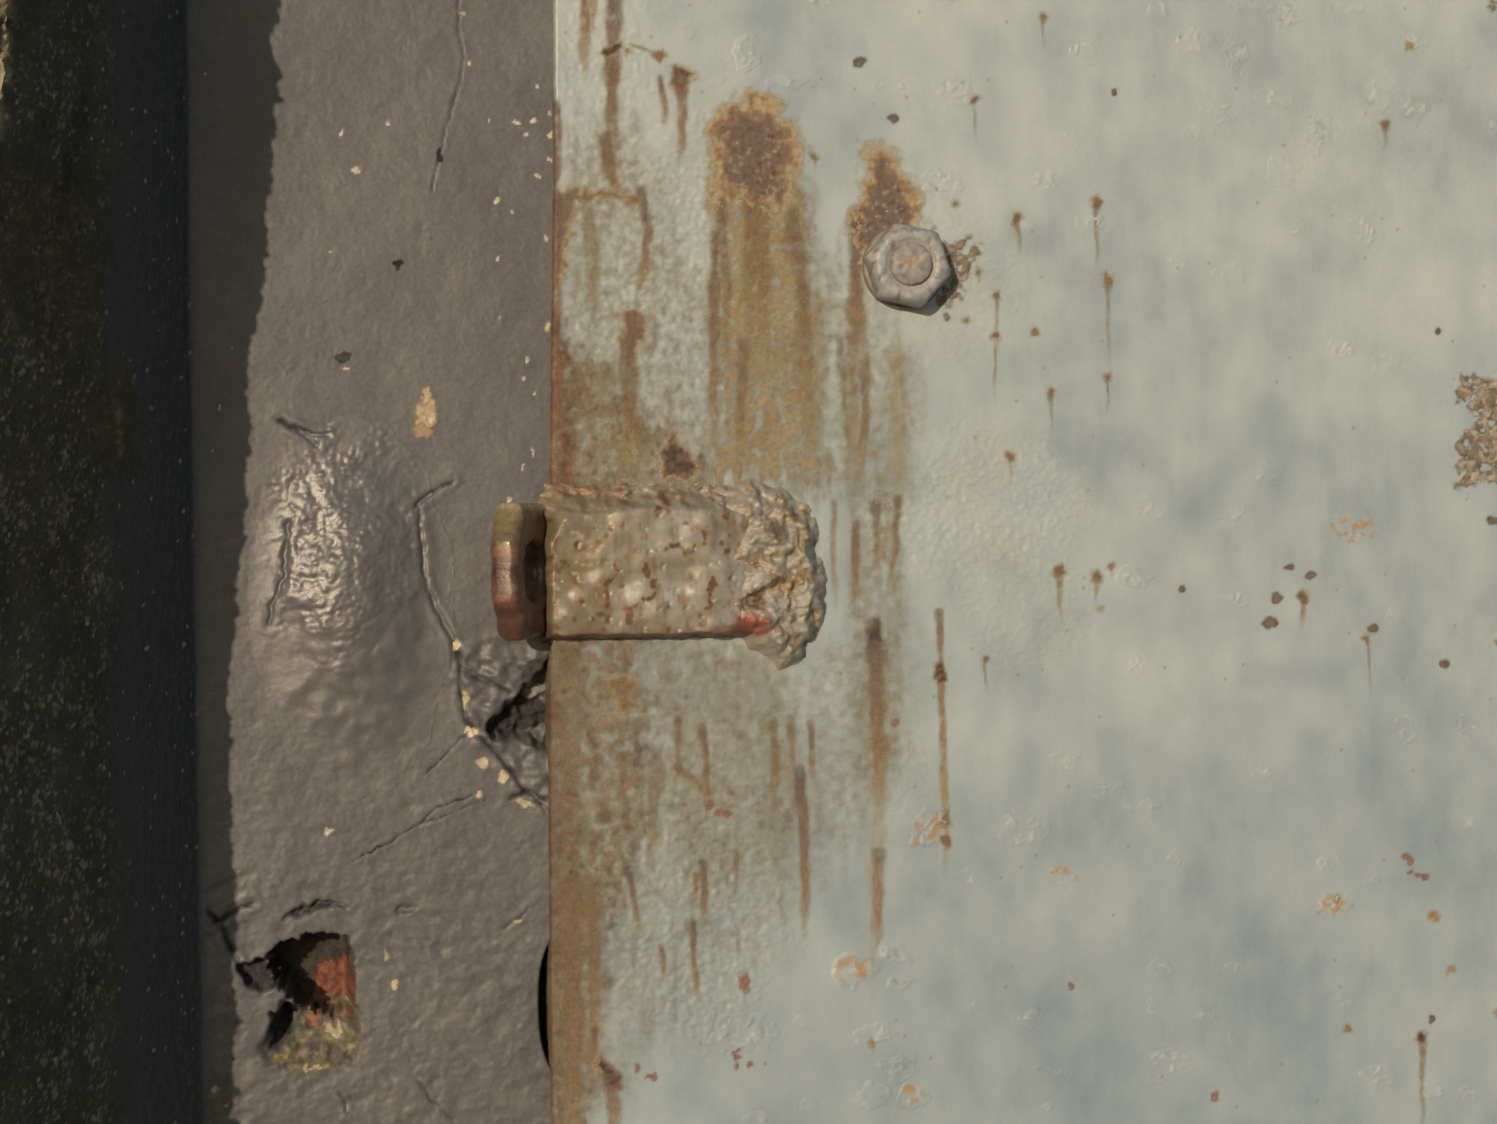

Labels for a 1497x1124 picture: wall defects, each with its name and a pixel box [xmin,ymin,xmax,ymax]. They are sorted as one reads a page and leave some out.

crack [436,148,444,162]
rust [549,0,830,492]
rust [844,140,925,467]
peeling [1454,374,1497,488]
crack [360,640,545,857]
rust [852,478,900,792]
rust [933,610,951,848]
rust [1296,590,1309,615]
hole [239,932,362,1073]
hole [287,901,341,916]
rust [542,638,814,1124]
rust [1416,1031,1426,1093]